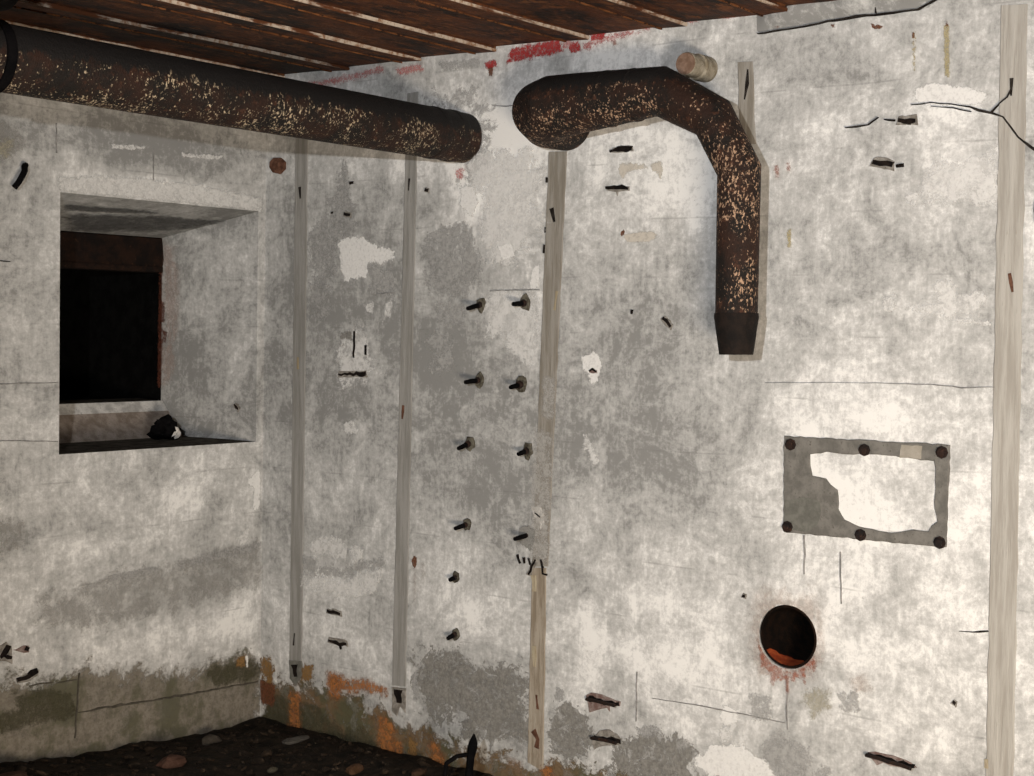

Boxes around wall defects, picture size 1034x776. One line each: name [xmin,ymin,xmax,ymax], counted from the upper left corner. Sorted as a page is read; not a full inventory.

crack [845,117,879,128]
crack [910,90,1034,151]
peeling [337,235,395,282]
rust [287,663,314,728]
damp [0,647,628,776]
rust [326,672,388,699]
rust [377,716,450,766]
peeling [546,687,831,776]
rust [759,647,816,692]